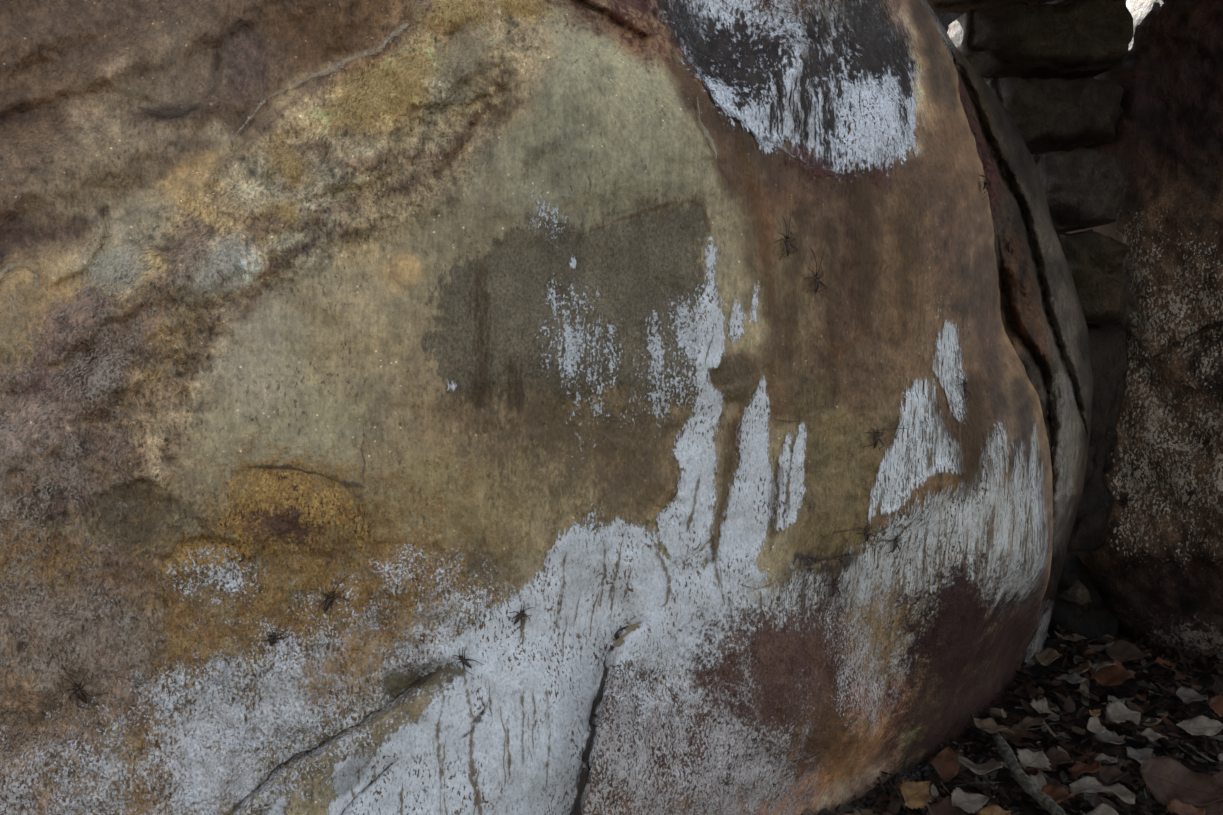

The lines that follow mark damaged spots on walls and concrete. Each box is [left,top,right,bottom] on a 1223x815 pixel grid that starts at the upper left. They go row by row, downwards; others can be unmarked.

crack [570,536,716,815]